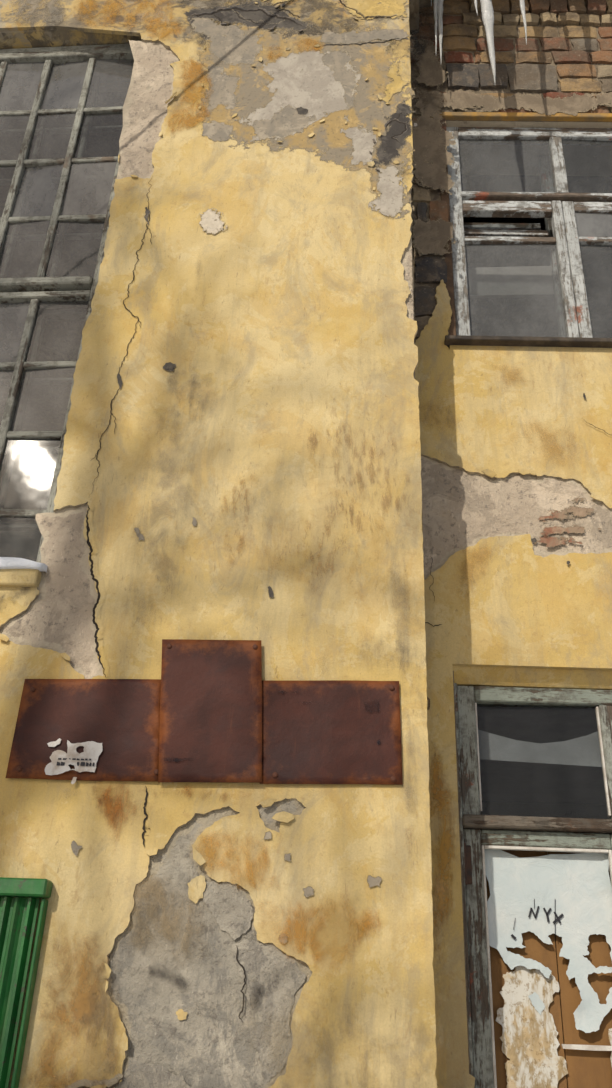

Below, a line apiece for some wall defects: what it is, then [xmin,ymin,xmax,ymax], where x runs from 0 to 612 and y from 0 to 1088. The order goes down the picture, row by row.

crack [189,6,303,26]
crack [319,0,409,48]
peeling [184,0,418,320]
crack [384,112,409,143]
crack [86,176,155,677]
spalling [421,456,612,580]
spalling [0,505,104,679]
rust [98,788,123,826]
spalling [257,798,305,839]
spalling [91,807,312,1088]